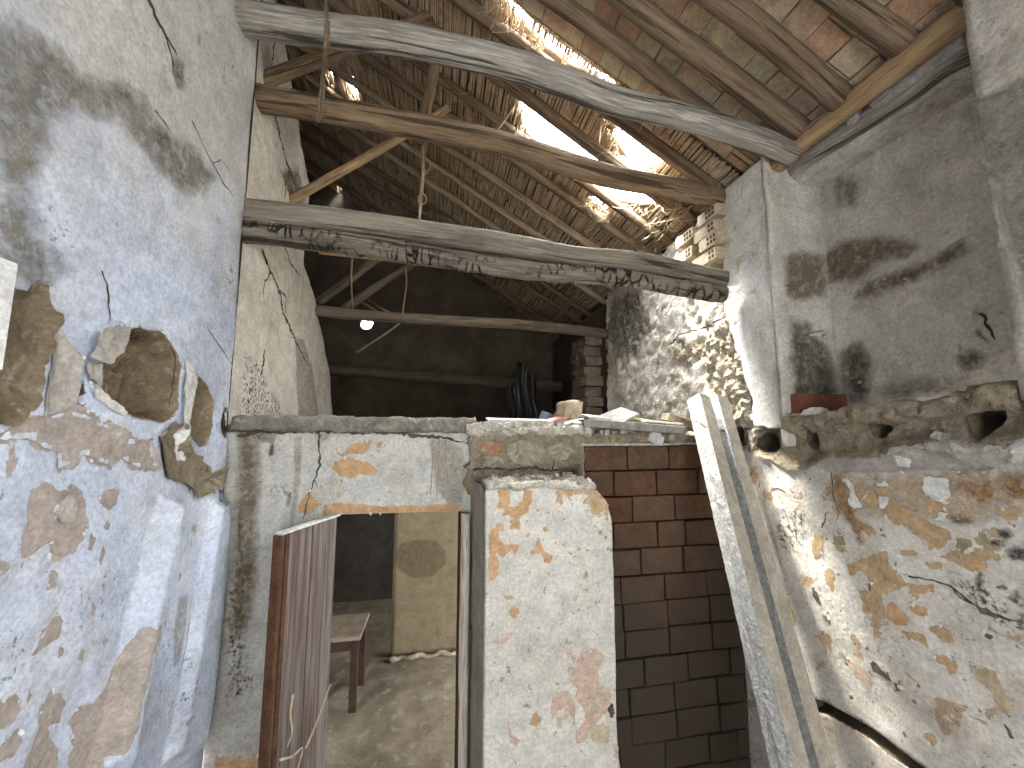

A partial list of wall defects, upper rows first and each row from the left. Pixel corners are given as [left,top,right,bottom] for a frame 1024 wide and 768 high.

crack [147,0,177,71]
damp [0,32,213,189]
spalling [0,280,229,498]
crack [262,248,309,365]
damp [791,323,870,401]
damp [785,239,964,298]
crack [237,415,468,519]
peeling [20,482,119,591]
damp [214,435,274,695]
spalling [750,400,1024,739]
crack [908,575,1023,623]
peeling [0,621,166,768]